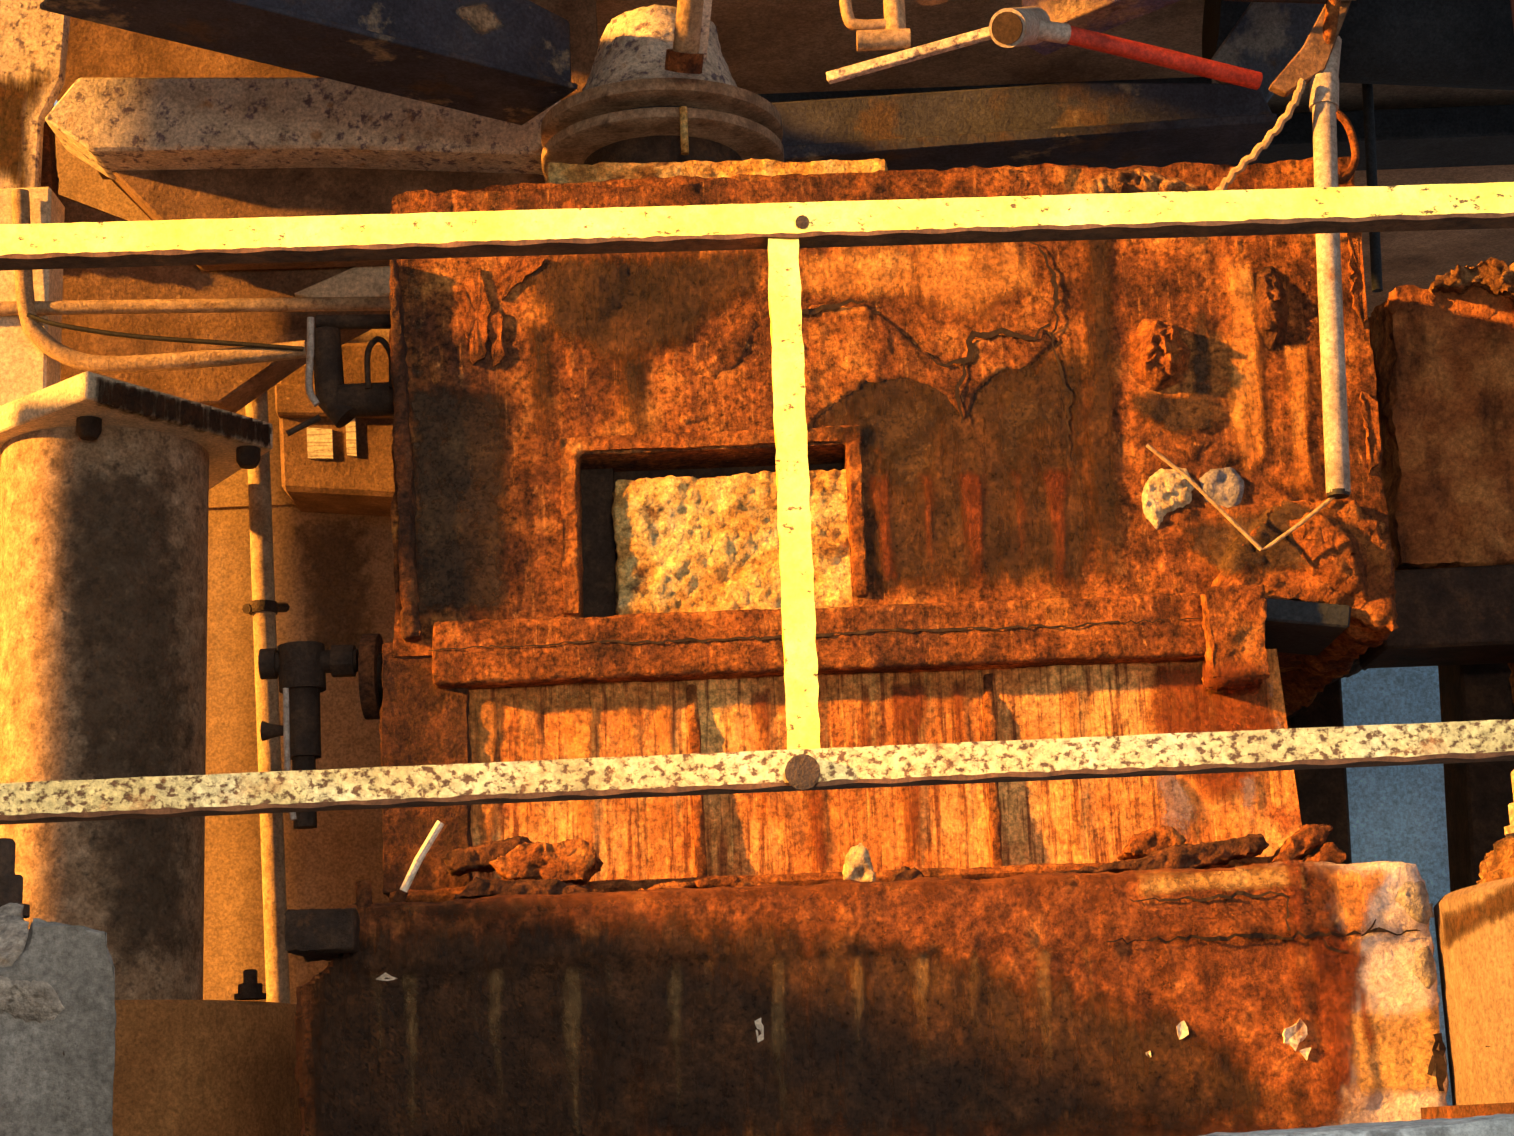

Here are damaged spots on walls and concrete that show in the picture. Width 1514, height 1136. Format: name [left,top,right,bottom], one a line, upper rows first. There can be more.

crack [801,299,864,315]
crack [930,242,1072,459]
rust [0,212,1514,590]
rust [475,699,495,763]
rust [518,698,536,747]
rust [563,695,591,759]
rust [754,690,770,737]
rust [892,684,926,745]
rust [1147,663,1270,734]
rust [0,751,1514,1136]